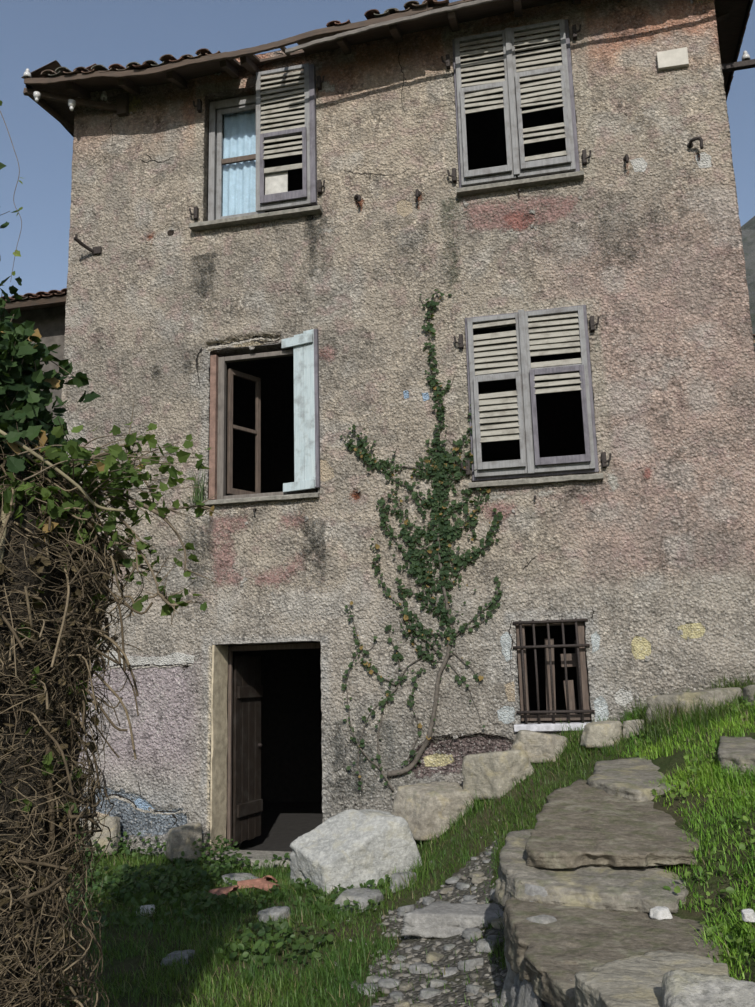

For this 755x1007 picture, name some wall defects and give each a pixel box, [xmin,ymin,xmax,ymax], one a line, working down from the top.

flaking render [80,785,189,840]